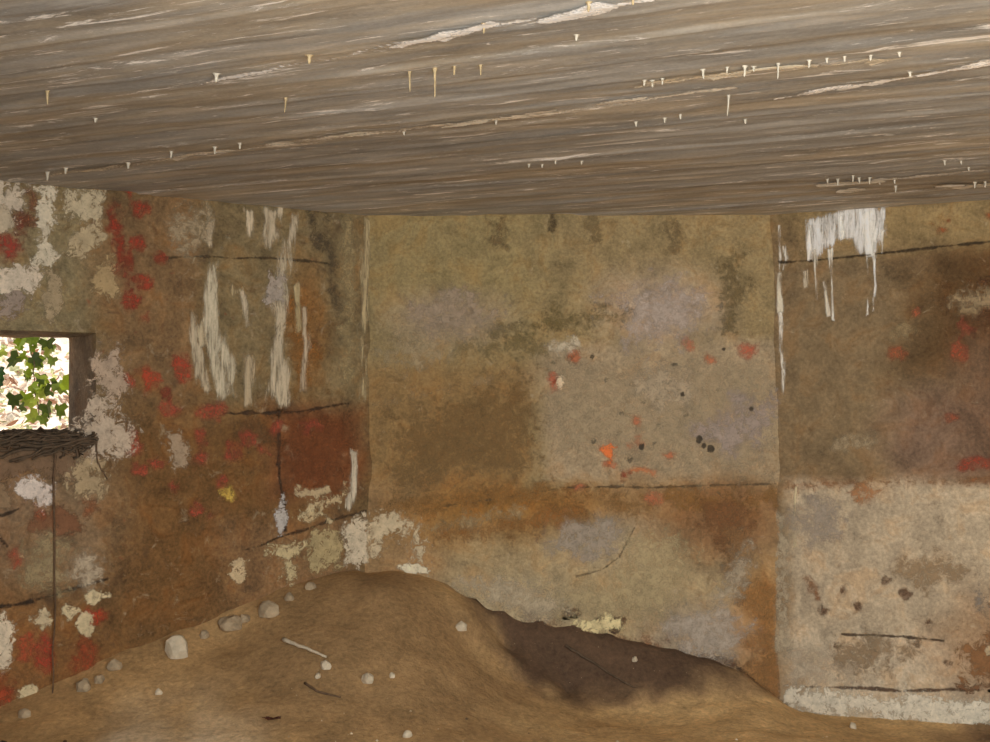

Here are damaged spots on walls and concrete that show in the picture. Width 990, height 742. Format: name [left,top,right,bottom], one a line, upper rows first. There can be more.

damp [189,265,358,524]
damp [246,207,323,407]
damp [366,368,540,576]
damp [309,210,706,400]
damp [717,254,753,335]
damp [803,208,885,320]
crack [779,241,990,264]
damp [816,170,990,193]